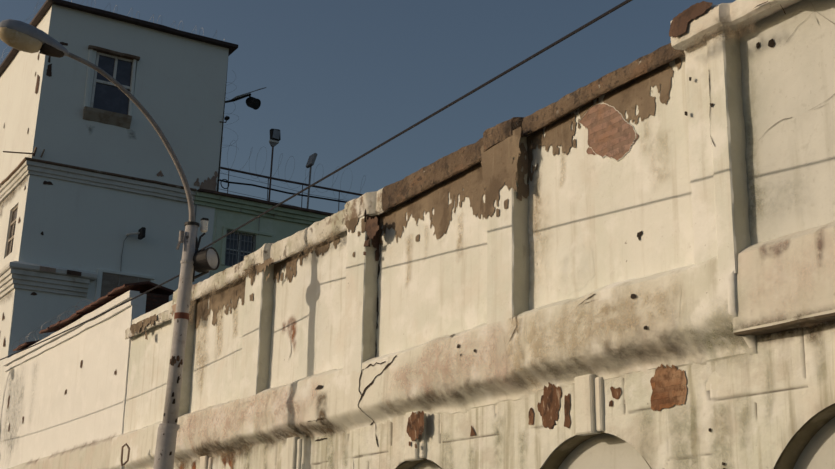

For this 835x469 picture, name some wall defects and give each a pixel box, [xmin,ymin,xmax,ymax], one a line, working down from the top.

spalling [669,1,712,38]
peeling [194,58,681,329]
crack [358,243,396,446]
peeling [528,382,570,429]
spalling [650,364,687,411]
peeling [406,411,424,449]